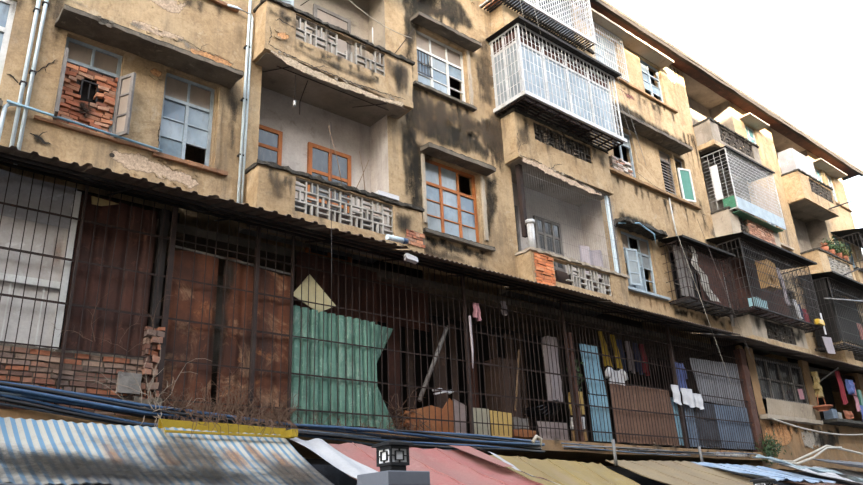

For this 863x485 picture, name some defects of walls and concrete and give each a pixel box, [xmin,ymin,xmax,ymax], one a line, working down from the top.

peeling [190,48,235,68]
peeling [271,50,404,107]
leakage [299,29,378,80]
leakage [377,0,504,216]
peeling [111,150,200,189]
leakage [397,215,411,230]
leakage [486,179,497,233]
rust [61,194,158,357]
leakage [424,237,487,269]
rust [161,250,378,421]